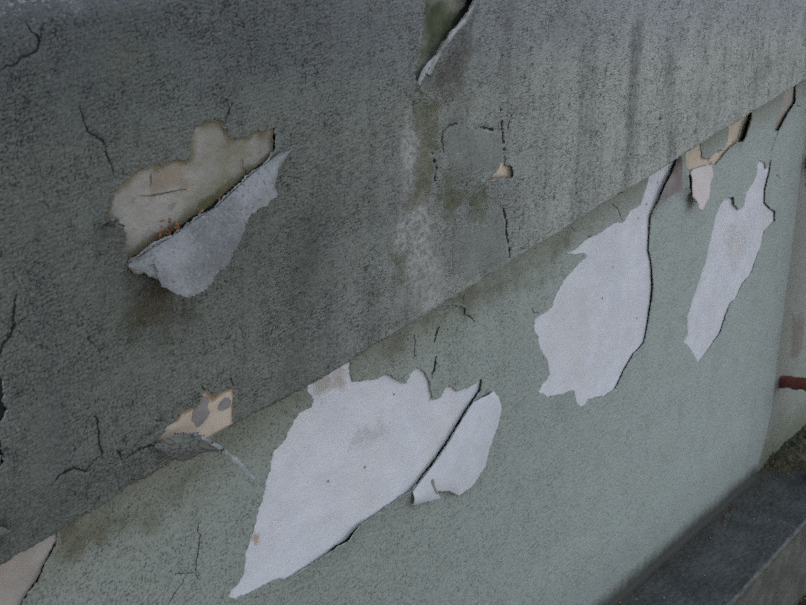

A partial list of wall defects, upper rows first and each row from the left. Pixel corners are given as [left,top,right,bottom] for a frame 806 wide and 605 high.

crack [80,107,115,178]
crack [480,106,513,144]
peeling [104,118,293,298]
crack [502,208,510,258]
peeling [534,115,751,406]
peeling [684,86,795,362]
crack [0,293,27,354]
crack [0,378,8,421]
crack [52,413,156,487]
peeling [155,388,255,481]
peeling [229,361,502,598]
peeling [0,533,57,605]